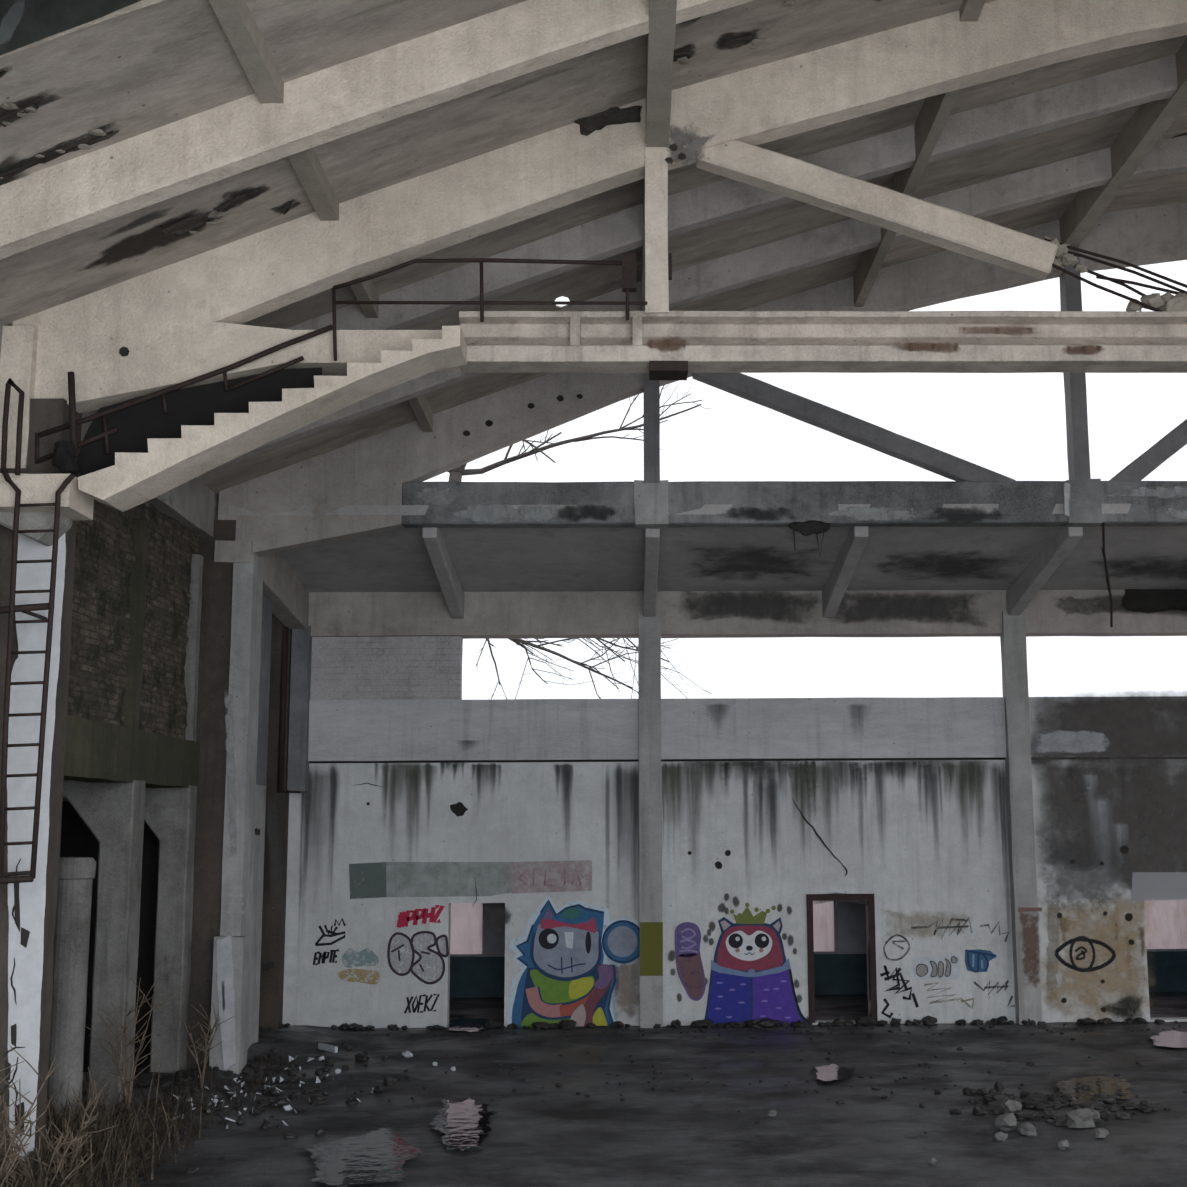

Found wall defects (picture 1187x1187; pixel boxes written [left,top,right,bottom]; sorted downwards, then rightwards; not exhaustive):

spalling [0,94,59,127]
spalling [574,105,642,136]
spalling [0,124,119,181]
rust [963,327,1032,335]
rust [899,343,958,352]
rust [1067,345,1101,354]
leakage [686,592,812,621]
spalling [1121,589,1187,613]
leakage [662,760,1006,815]
crack [792,798,848,876]
leakage [1032,692,1187,991]
mould [1106,997,1140,1019]